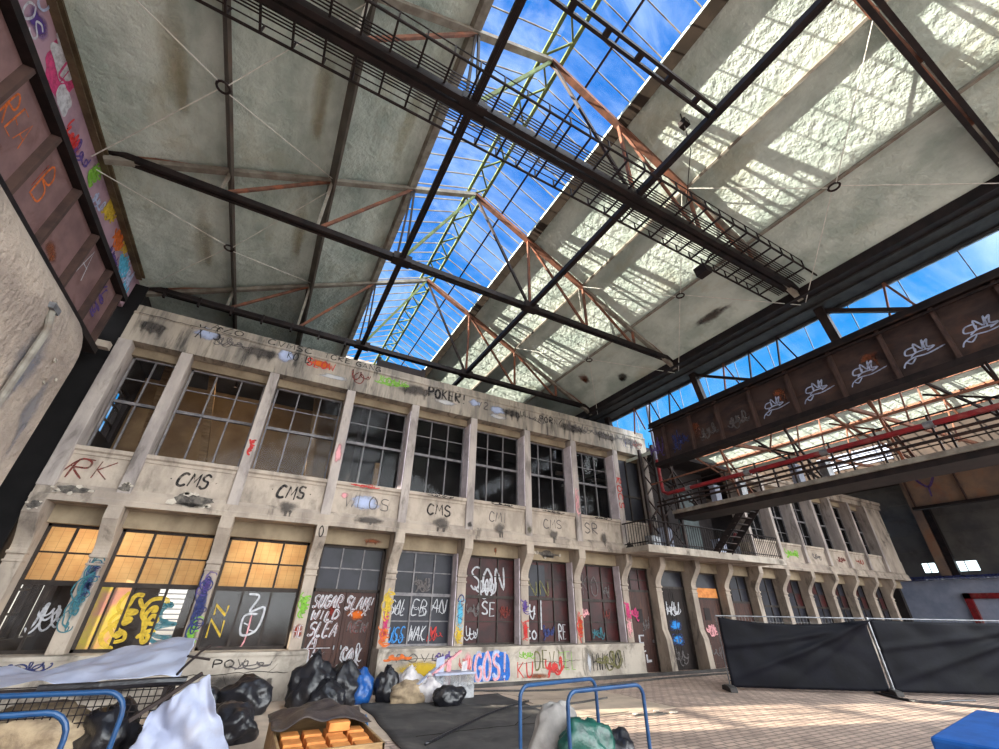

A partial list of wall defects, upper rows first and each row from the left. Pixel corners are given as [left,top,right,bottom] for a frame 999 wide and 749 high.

water stain [698,306,727,325]
spalling [166,492,214,509]